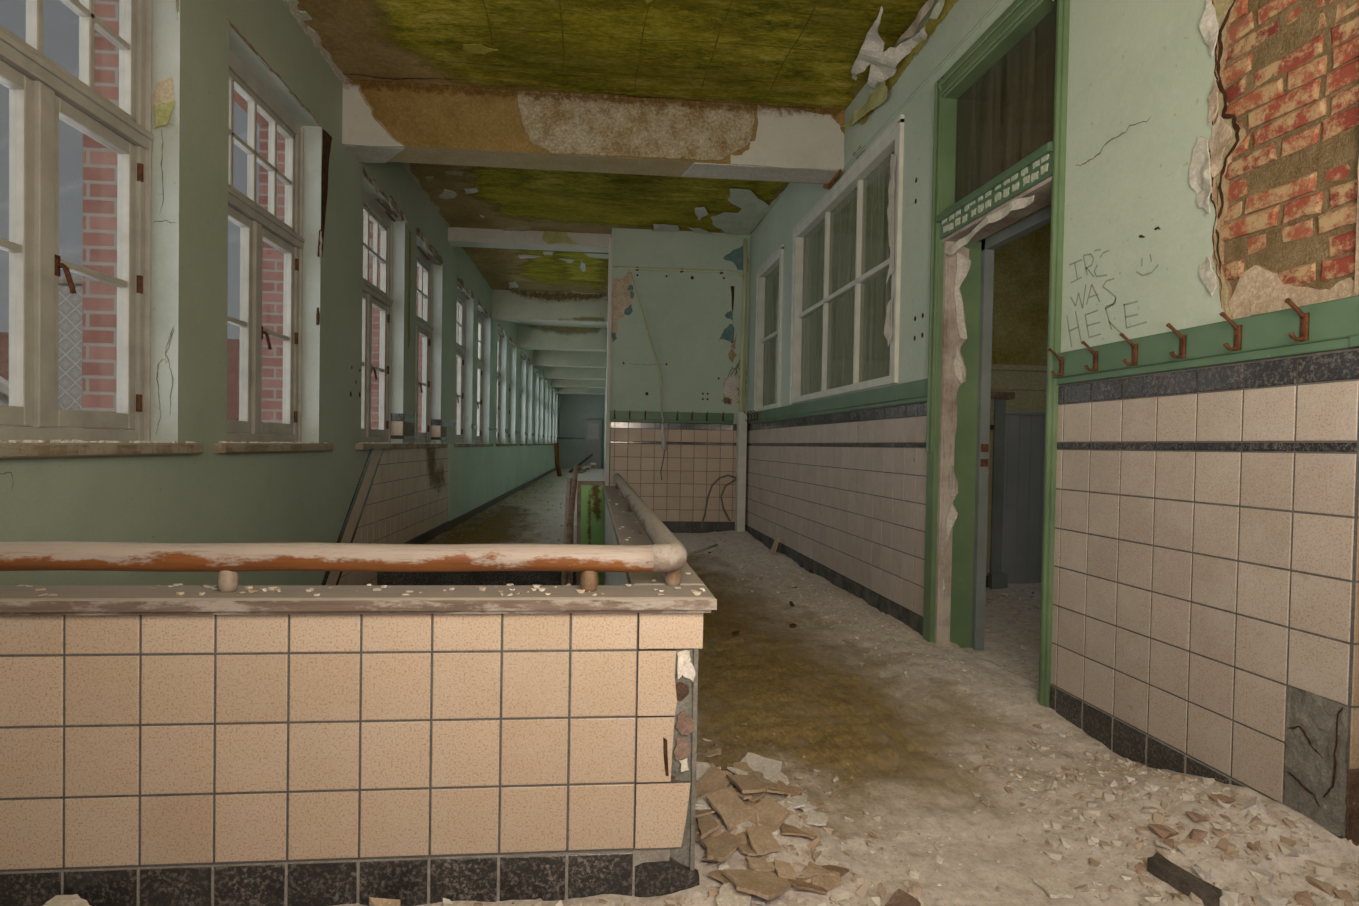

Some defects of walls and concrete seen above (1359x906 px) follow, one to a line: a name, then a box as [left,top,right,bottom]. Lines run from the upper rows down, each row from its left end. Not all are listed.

water stain [346,0,958,115]
water stain [462,166,788,232]
flaking render [517,0,945,283]
flaking render [1189,0,1359,320]
water stain [511,249,609,302]
water stain [533,318,604,334]
flaking render [719,286,740,403]
peeling [884,298,893,346]
peeling [939,154,1049,595]
flaking render [663,649,695,867]